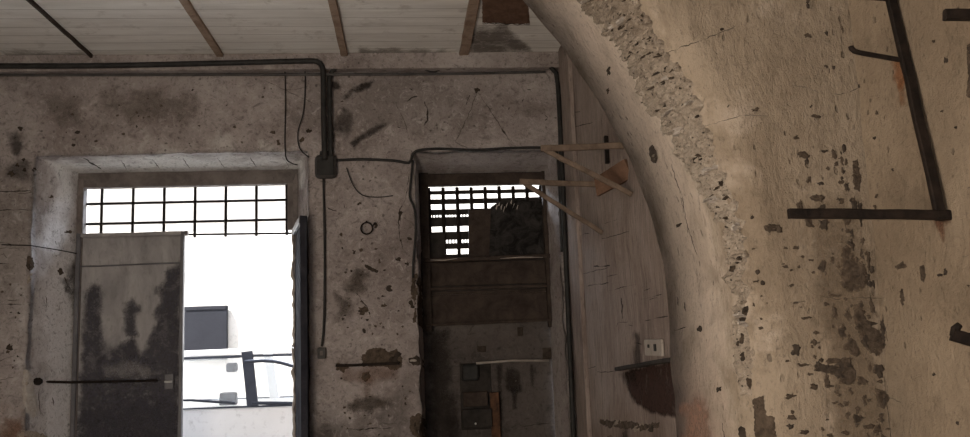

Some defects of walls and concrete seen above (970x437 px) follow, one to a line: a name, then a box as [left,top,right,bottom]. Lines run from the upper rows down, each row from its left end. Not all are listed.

spalling [577,0,809,437]
spalling [342,293,384,335]
spalling [395,257,423,335]
peeling [782,144,891,437]
spalling [6,344,41,418]
spalling [361,348,424,405]
spalling [409,413,427,437]